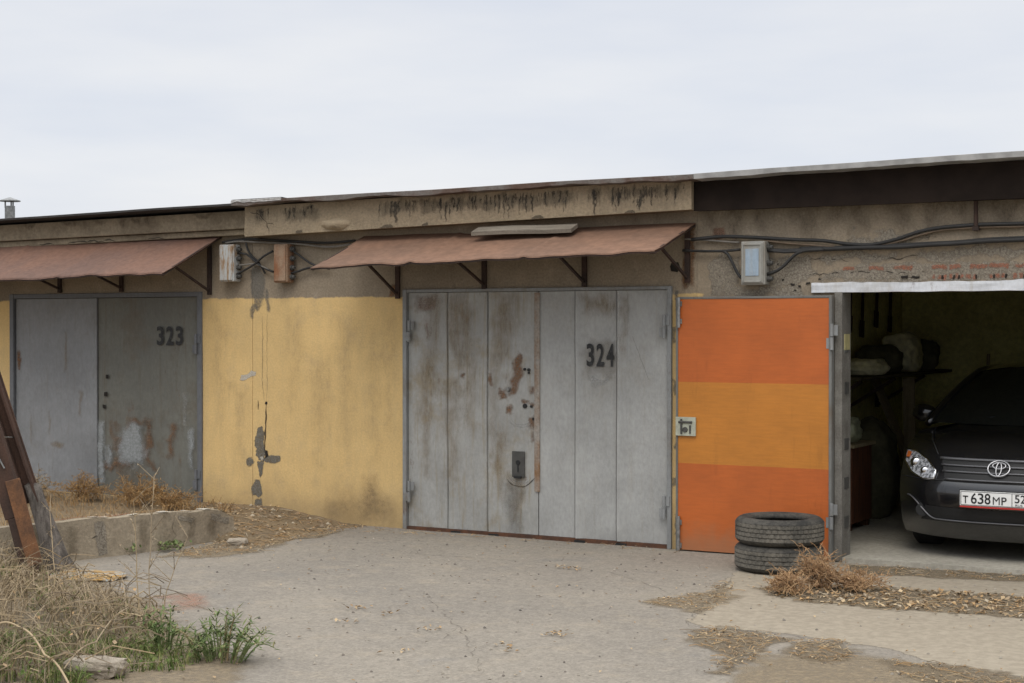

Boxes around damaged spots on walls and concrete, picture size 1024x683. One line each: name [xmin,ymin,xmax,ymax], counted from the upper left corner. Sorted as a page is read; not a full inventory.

damp [424,191,568,218]
spalling [708,228,1024,296]
corrosion [488,355,534,437]
spalling [246,426,280,505]